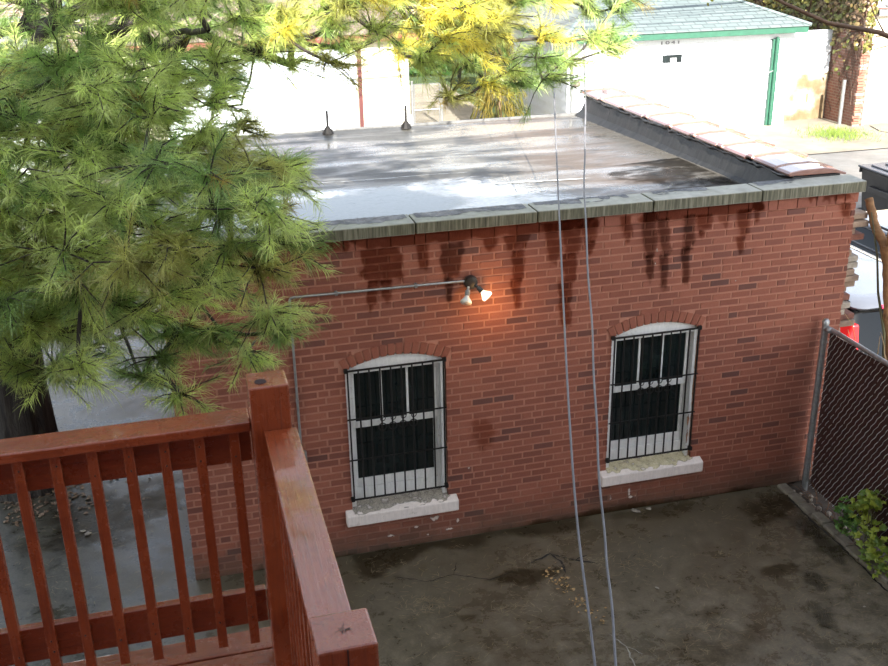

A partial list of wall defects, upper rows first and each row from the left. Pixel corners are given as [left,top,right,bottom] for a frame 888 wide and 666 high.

spalling [838,208,869,344]